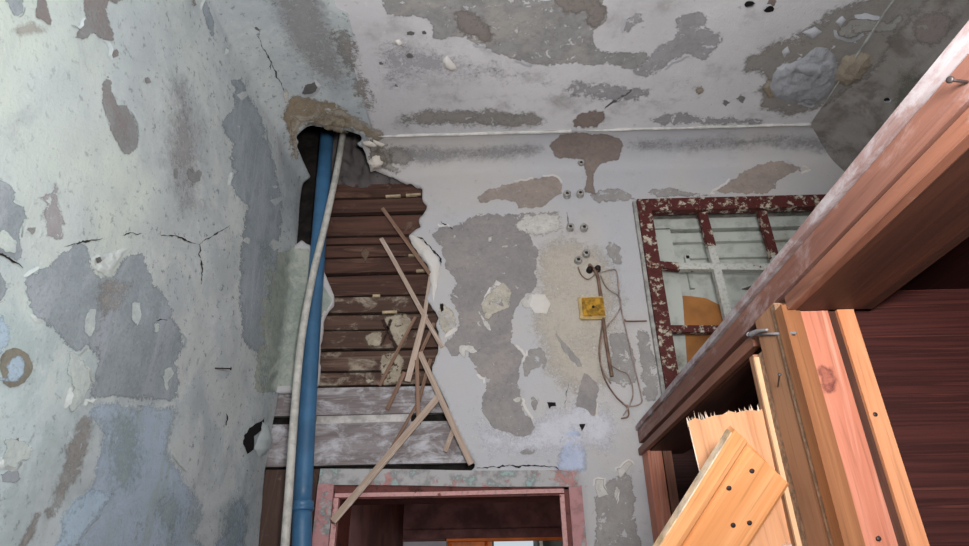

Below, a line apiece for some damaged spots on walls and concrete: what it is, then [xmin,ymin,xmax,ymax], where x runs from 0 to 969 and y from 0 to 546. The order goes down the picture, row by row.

crack [256,34,284,90]
peeling [382,0,723,77]
peeling [802,13,903,42]
flaking render [306,113,354,133]
peeling [0,180,36,260]
flaking render [363,139,398,175]
peeling [590,188,634,203]
peeling [648,161,811,197]
crack [65,225,230,284]
peeling [23,241,189,412]
peeling [410,174,563,437]
peeling [593,459,634,503]